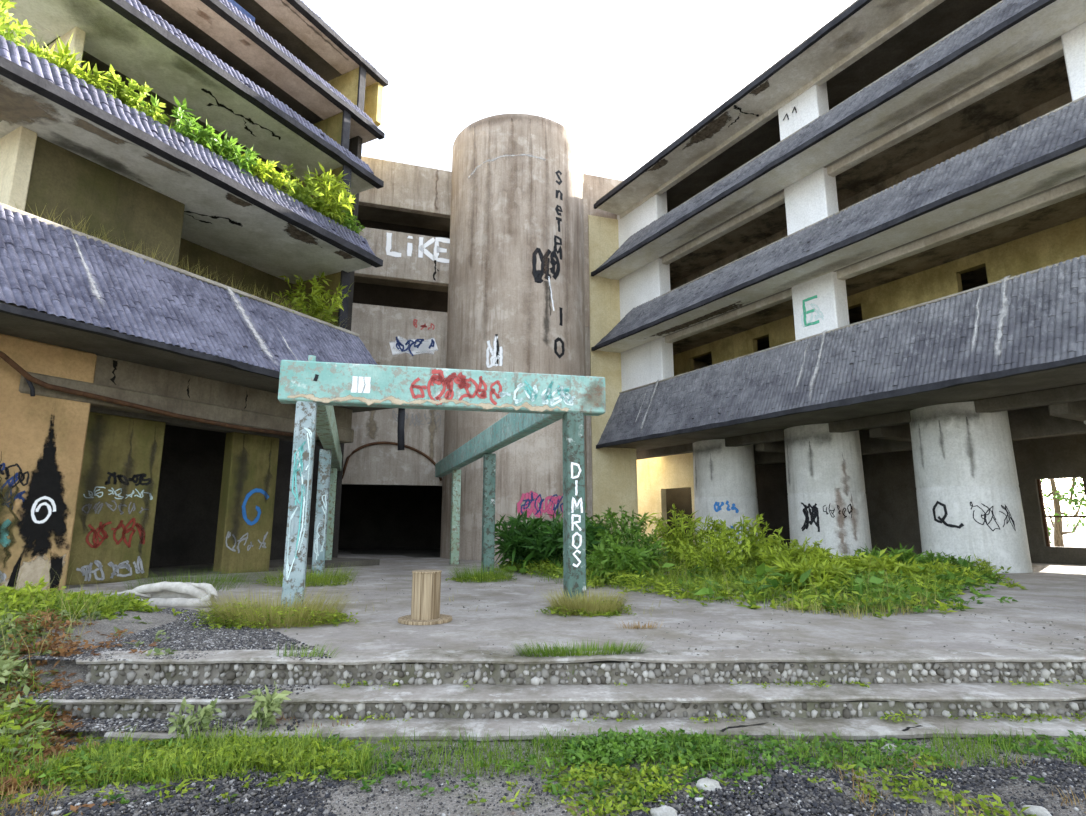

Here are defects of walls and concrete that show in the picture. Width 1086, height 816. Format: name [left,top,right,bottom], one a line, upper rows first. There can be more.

spalling [749,80,769,96]
crack [201,88,281,140]
spalling [682,111,732,150]
spalling [646,159,668,172]
crack [184,211,243,227]
peeling [288,394,569,412]
leakage [0,472,25,587]